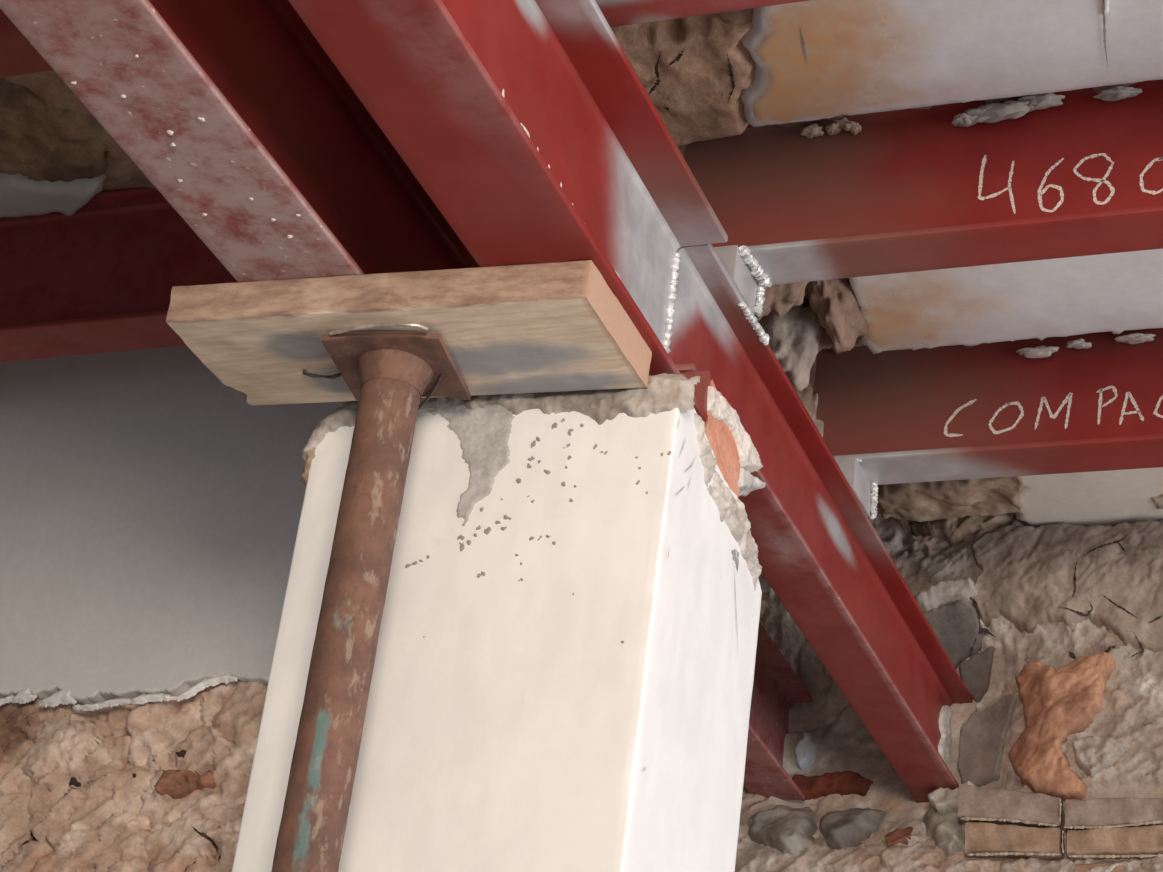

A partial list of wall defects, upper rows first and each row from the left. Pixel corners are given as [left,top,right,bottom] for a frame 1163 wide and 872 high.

crack [649,46,686,111]
spalling [611,14,756,146]
crack [726,51,735,104]
corrosion [754,0,882,122]
crack [1102,0,1110,73]
spalling [300,401,359,487]
spalling [419,373,766,590]
crack [1057,530,1163,658]
spalling [0,673,238,711]
flaking render [154,769,216,799]
flaking render [957,652,1163,872]